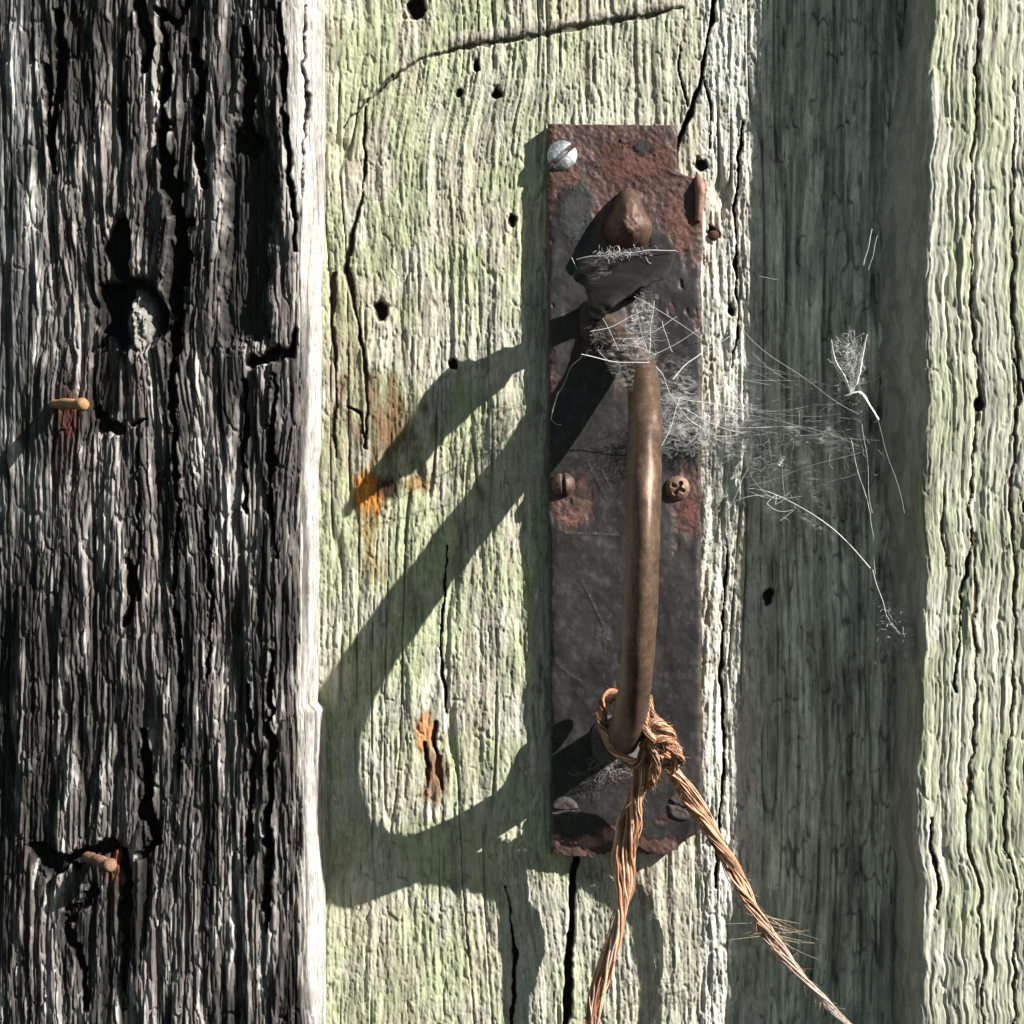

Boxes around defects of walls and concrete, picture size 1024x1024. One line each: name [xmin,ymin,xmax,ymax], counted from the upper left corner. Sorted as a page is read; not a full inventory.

crack [677,0,716,153]
crack [329,107,369,458]
corrosion [600,133,701,253]
crack [731,121,744,368]
corrosion [347,369,428,569]
corrosion [558,472,588,528]
crack [940,2,1024,1024]
corrosion [416,712,445,803]
crack [714,545,729,888]
corrosion [105,846,124,897]
crack [562,856,580,1024]
crack [928,817,942,910]